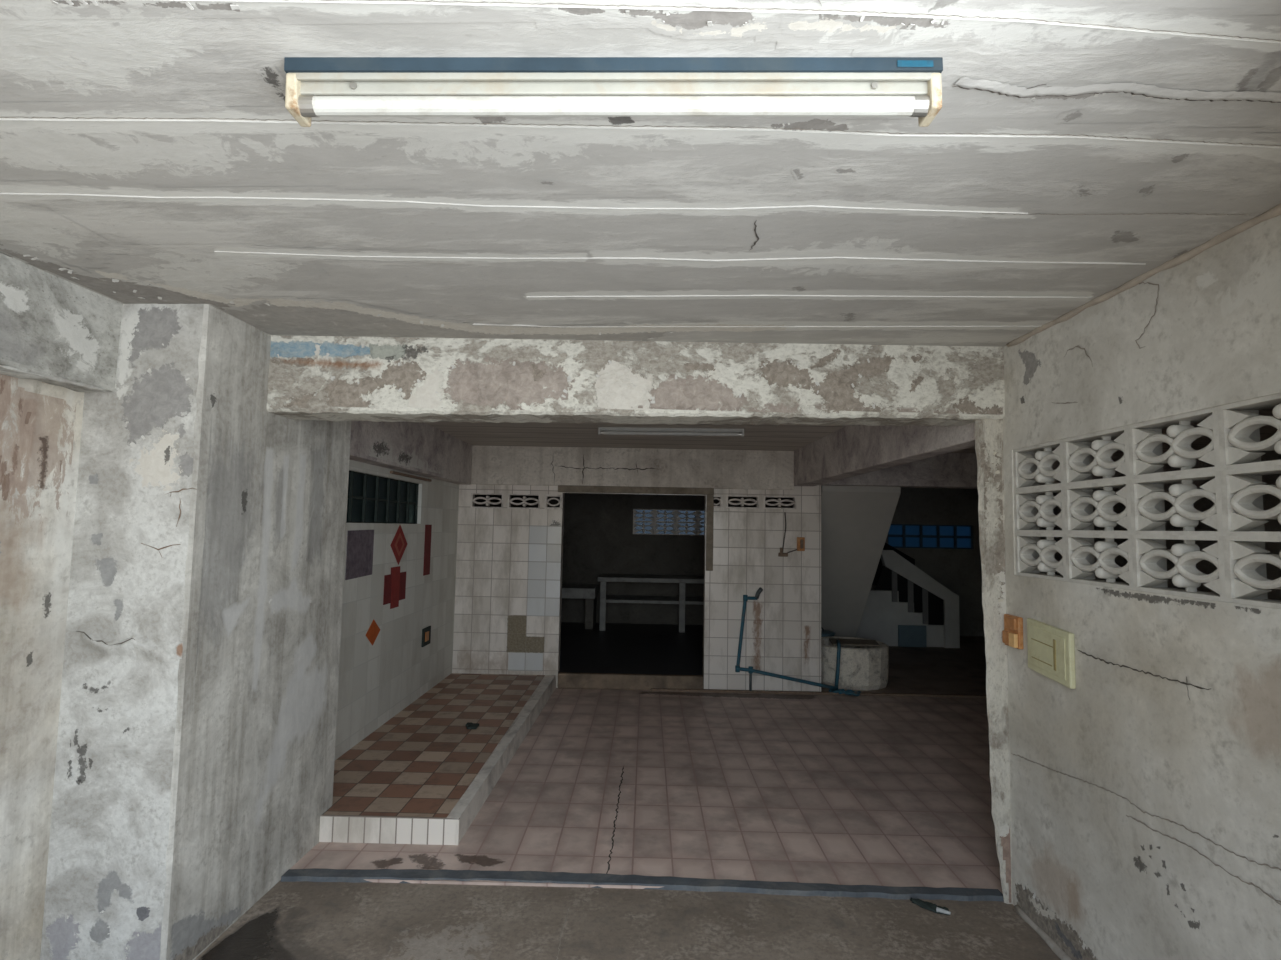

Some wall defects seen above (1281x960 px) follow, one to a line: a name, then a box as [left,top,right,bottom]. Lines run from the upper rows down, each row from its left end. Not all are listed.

peeling [467,116,518,125]
peeling [601,116,636,126]
peeling [766,116,854,134]
crack [953,77,1281,103]
peeling [0,237,1003,496]
peeling [88,531,128,622]
crack [1078,650,1210,700]
crack [1011,753,1281,905]
peeling [42,865,252,960]
water stain [241,900,369,960]
spalling [999,821,1102,960]
spalling [1132,843,1202,932]